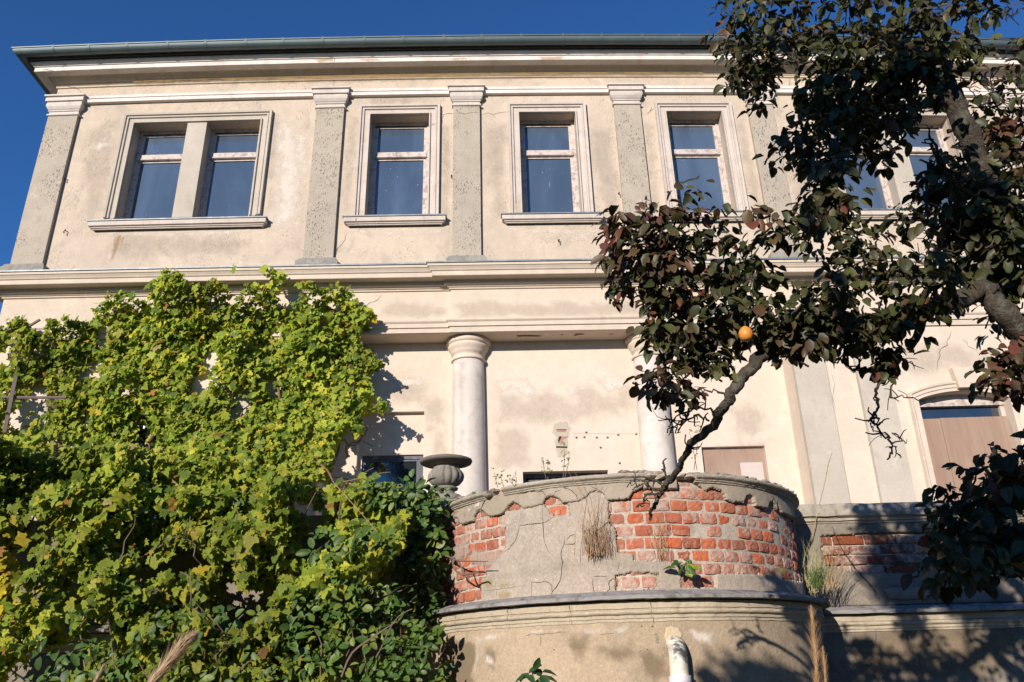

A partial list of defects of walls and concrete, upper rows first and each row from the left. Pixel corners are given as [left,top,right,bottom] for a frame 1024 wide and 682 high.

spalling [438,503,522,607]
crack [485,484,608,644]
spalling [544,496,571,516]
spalling [821,534,940,573]